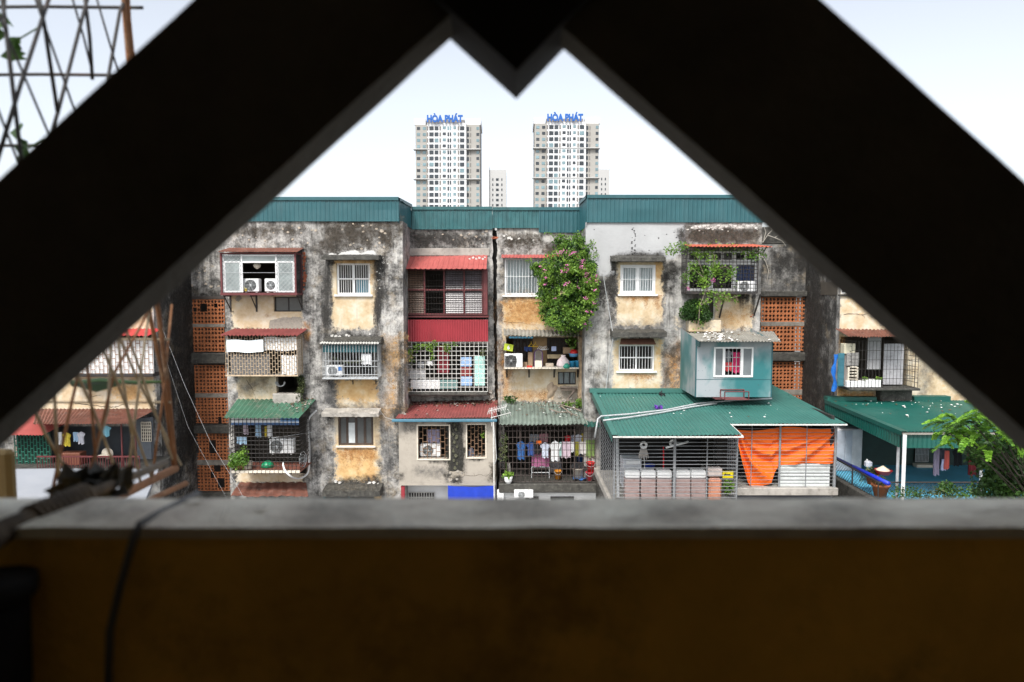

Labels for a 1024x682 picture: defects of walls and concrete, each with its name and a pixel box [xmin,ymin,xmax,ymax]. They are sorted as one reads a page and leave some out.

mould [241,225,306,242]
leakage [394,367,405,419]
leakage [311,216,489,364]
crack [464,230,526,489]
leakage [595,229,685,313]
leakage [658,226,760,253]
leakage [729,286,781,308]
leakage [771,250,829,413]